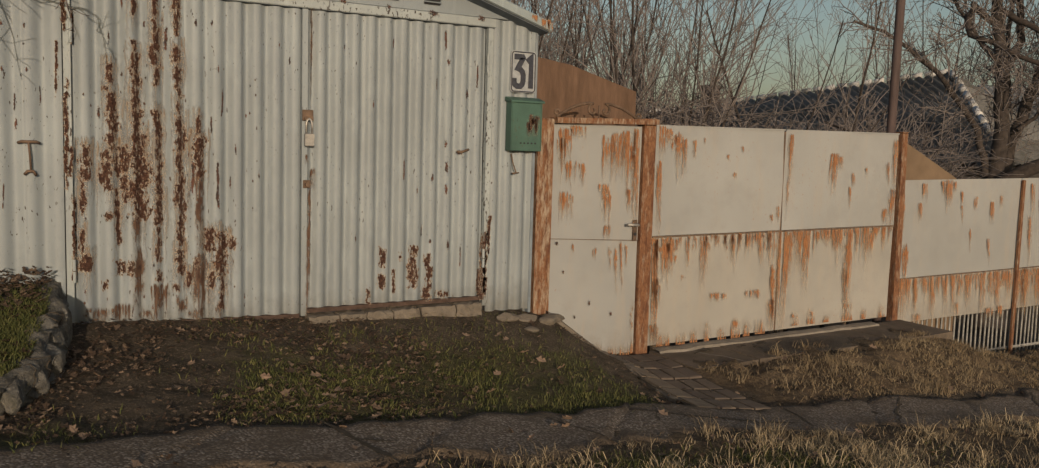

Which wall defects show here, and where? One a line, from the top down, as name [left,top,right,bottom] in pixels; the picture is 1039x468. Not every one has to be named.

corrosion [54,0,236,321]
corrosion [365,244,450,305]
corrosion [476,215,492,301]
corrosion [557,125,586,178]
corrosion [599,184,611,234]
corrosion [602,129,640,224]
corrosion [649,126,905,347]
corrosion [899,244,1039,322]